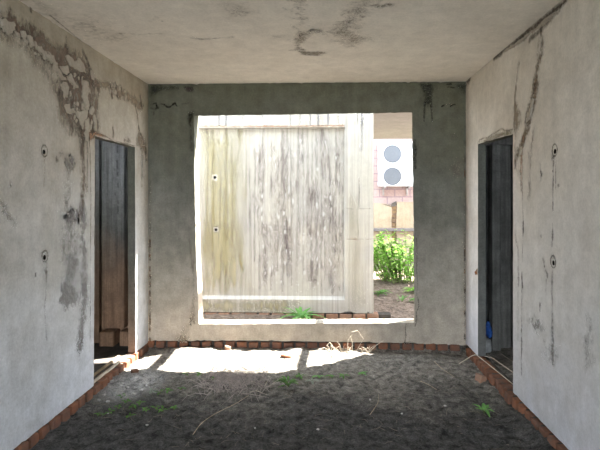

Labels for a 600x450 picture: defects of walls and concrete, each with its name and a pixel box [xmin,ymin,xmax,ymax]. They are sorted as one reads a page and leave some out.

peeling [0,18,99,141]
leakage [421,83,432,118]
crack [493,0,567,187]
leakage [59,125,87,354]